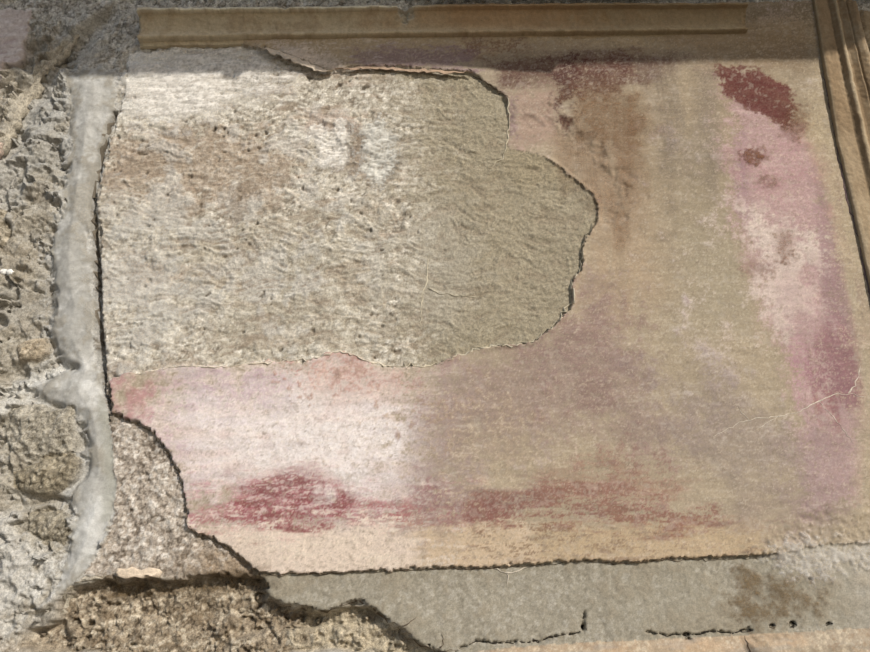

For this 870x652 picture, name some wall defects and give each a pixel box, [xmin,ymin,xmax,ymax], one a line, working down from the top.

spalling [20,44,599,652]